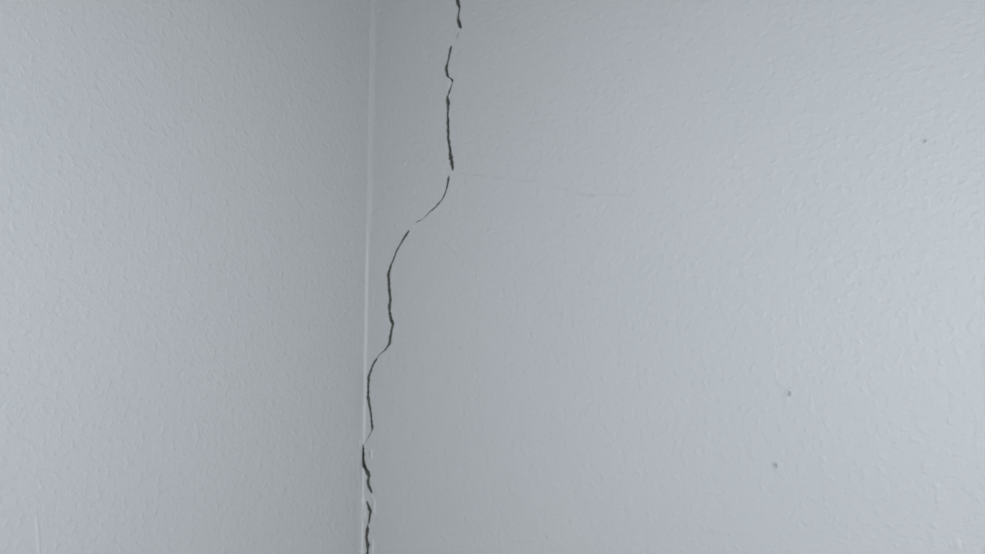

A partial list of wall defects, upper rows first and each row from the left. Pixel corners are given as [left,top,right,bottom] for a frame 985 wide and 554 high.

crack [357,0,462,554]